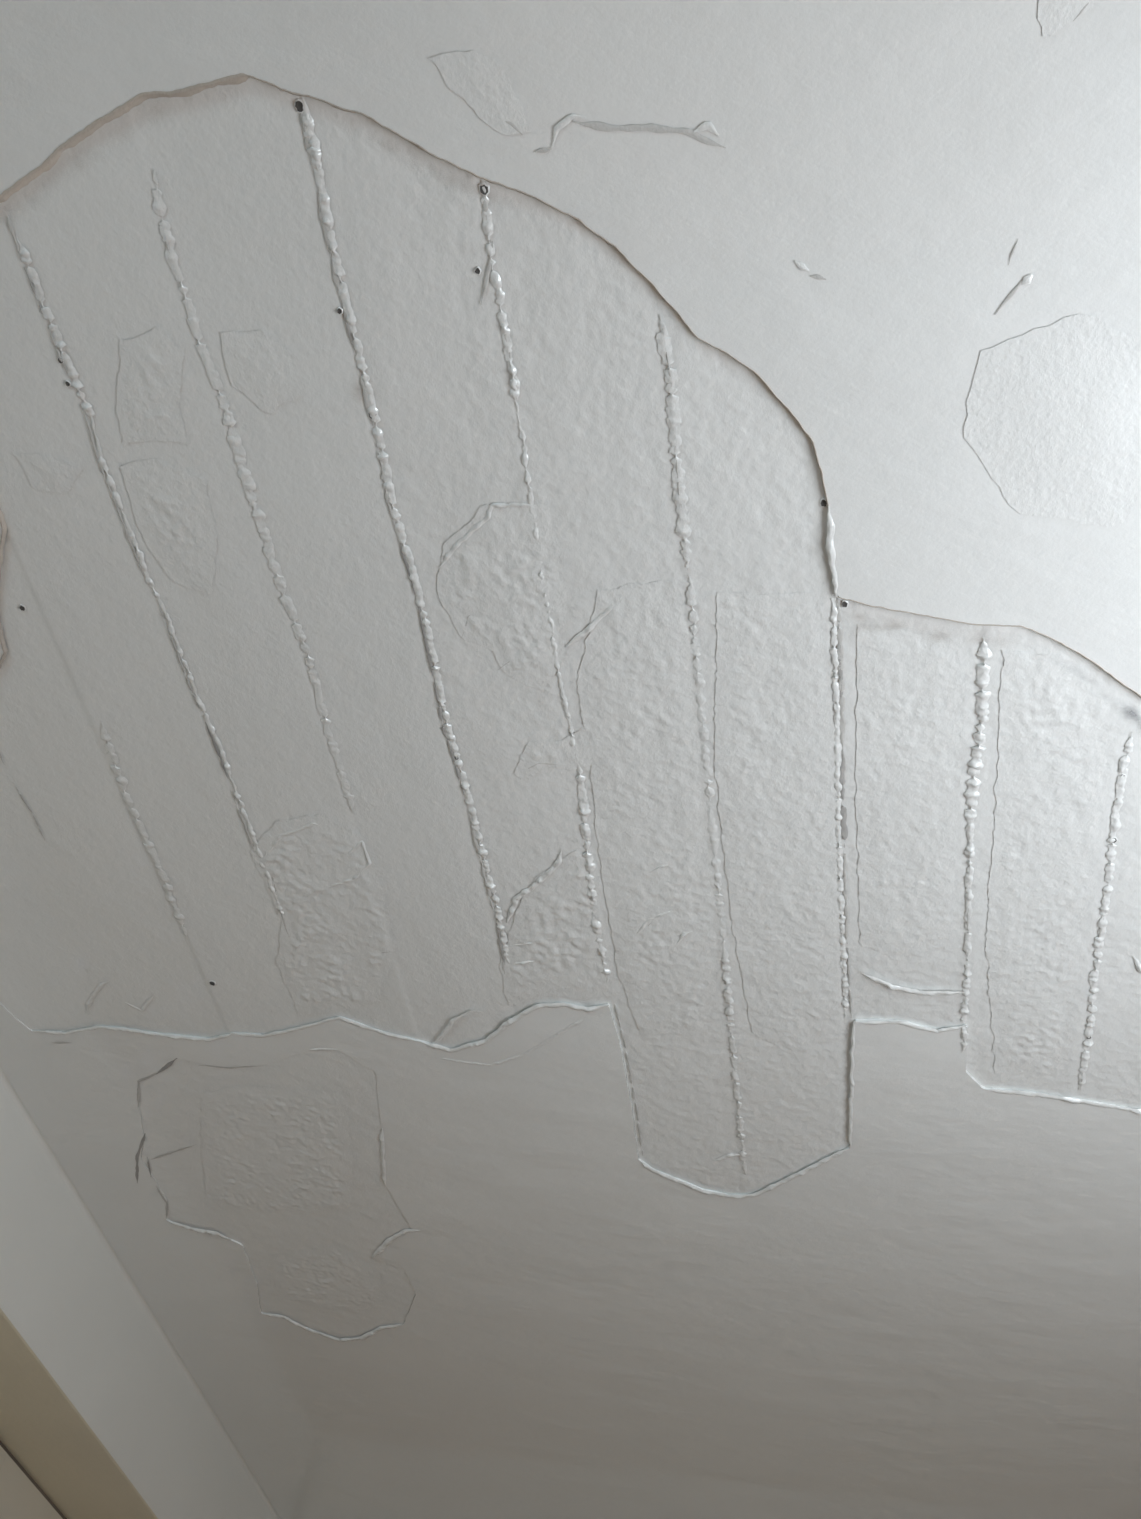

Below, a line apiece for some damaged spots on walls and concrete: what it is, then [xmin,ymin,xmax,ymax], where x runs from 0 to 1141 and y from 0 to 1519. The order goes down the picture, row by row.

crack [0,206,284,918]
crack [152,169,354,814]
crack [294,96,509,964]
crack [474,181,643,1156]
crack [535,114,726,153]
crack [809,273,826,281]
crack [994,240,1023,315]